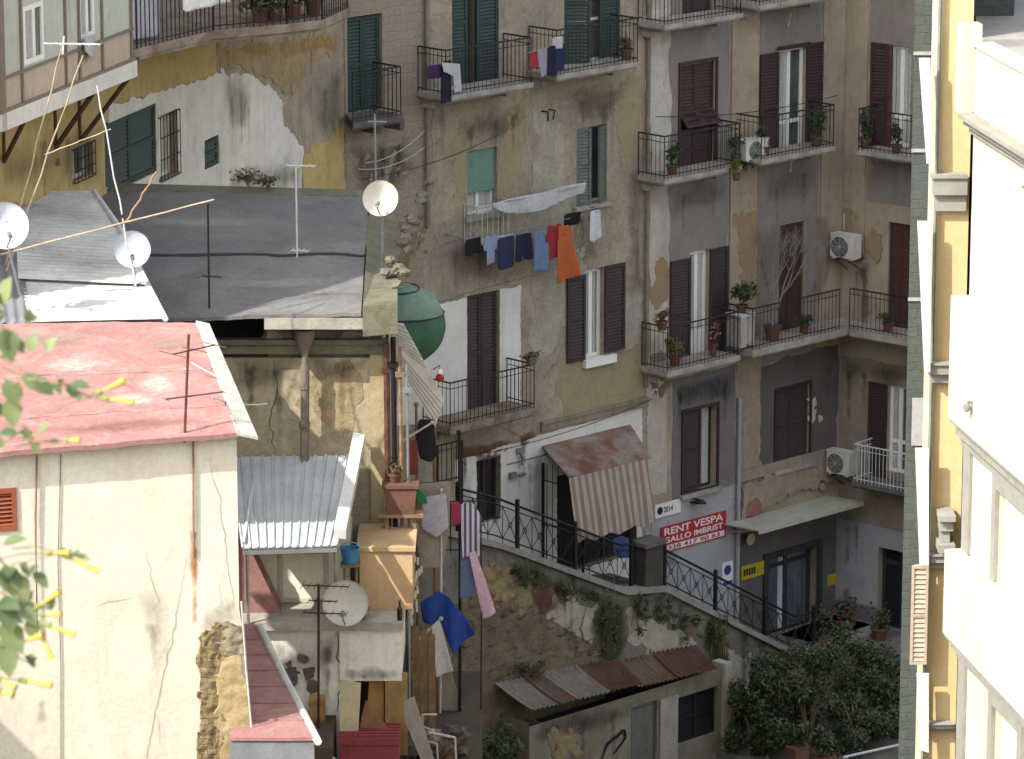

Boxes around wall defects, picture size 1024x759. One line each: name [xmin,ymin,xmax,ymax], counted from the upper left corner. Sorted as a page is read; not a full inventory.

peeling [301,119,346,189]
flaking render [398,212,428,269]
peeling [732,210,760,305]
peeling [555,257,672,416]
crack [269,358,288,453]
crack [210,463,238,619]
peeling [746,498,762,516]
crack [98,554,187,753]
flaking render [196,621,250,759]
flaking render [525,718,584,759]